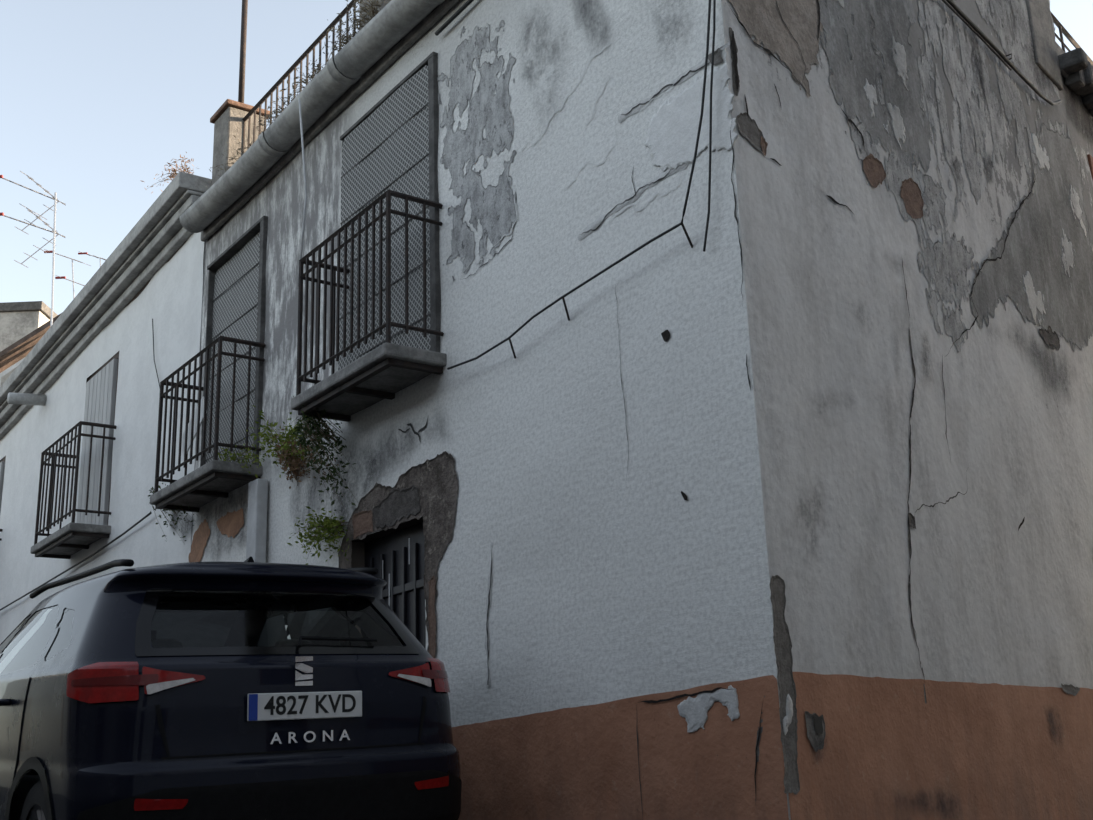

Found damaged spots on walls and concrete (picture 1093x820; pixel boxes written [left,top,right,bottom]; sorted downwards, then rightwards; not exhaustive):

peeling [437,20,518,282]
crack [578,163,689,241]
crack [618,27,743,306]
peeling [728,0,1093,356]
spalling [189,508,244,562]
spalling [338,451,458,658]
crack [485,542,493,689]
peeling [641,685,740,733]
spalling [769,575,826,795]
crack [902,261,968,703]